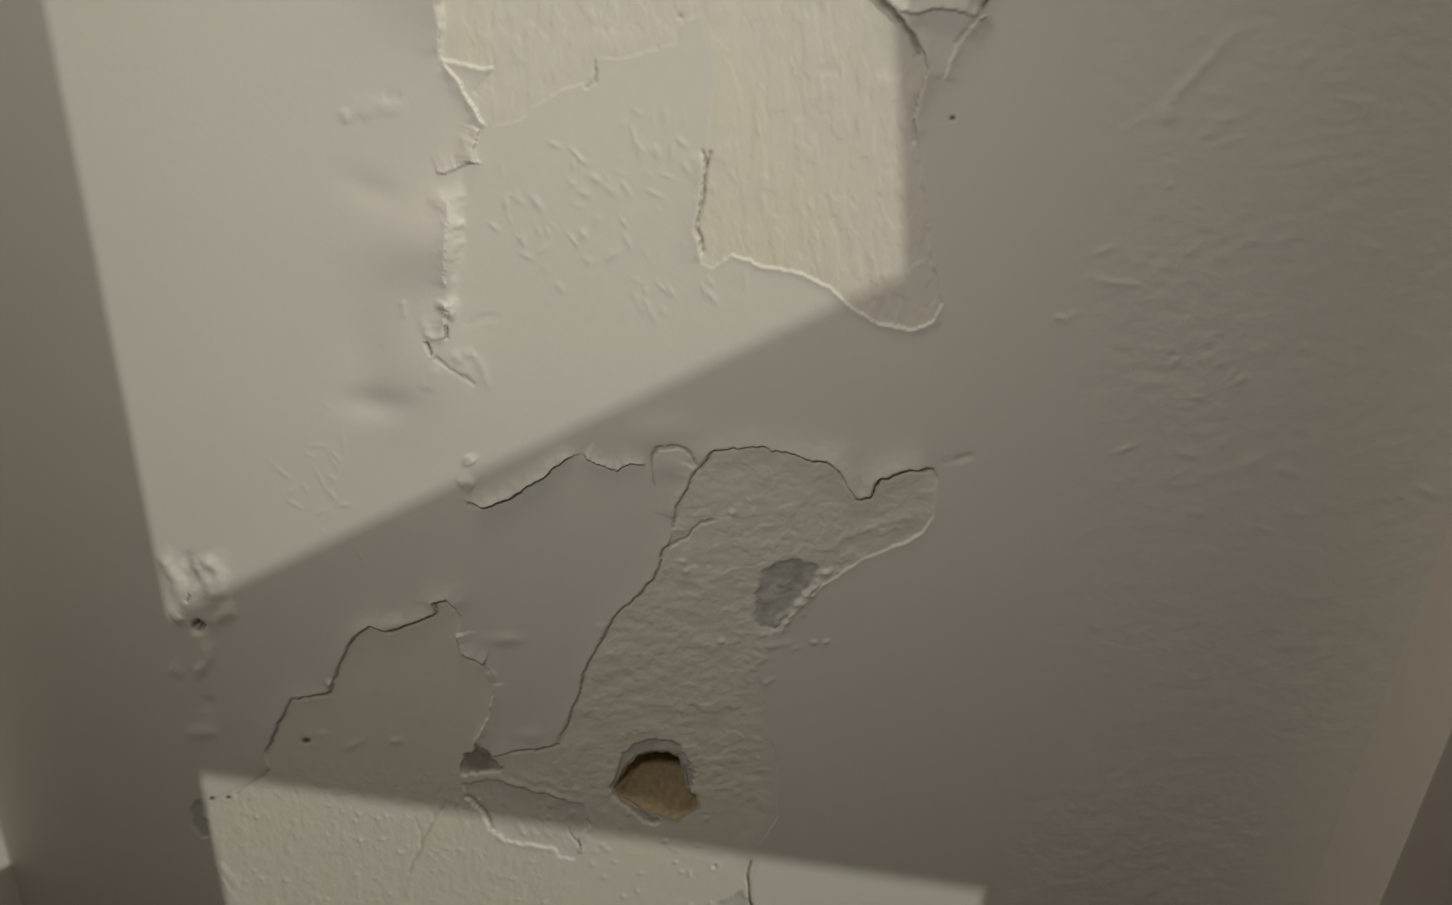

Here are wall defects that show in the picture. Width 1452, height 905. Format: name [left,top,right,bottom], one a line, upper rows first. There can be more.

peeling [399,0,952,398]
peeling [190,414,959,905]